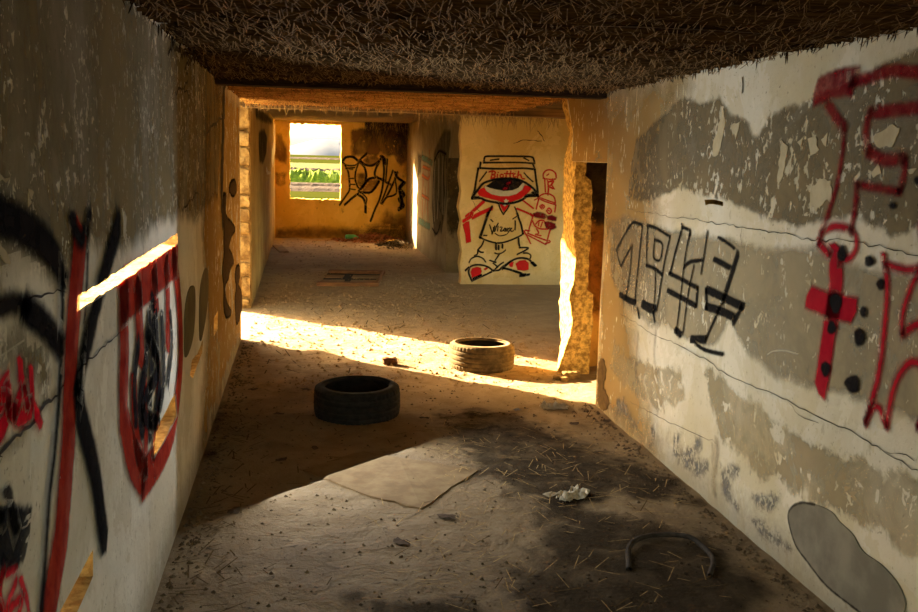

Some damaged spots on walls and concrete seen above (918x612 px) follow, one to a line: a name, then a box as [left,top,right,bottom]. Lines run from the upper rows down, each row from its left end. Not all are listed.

peeling [629,49,918,236]
crack [33,289,66,298]
crack [628,208,918,256]
crack [621,314,917,470]